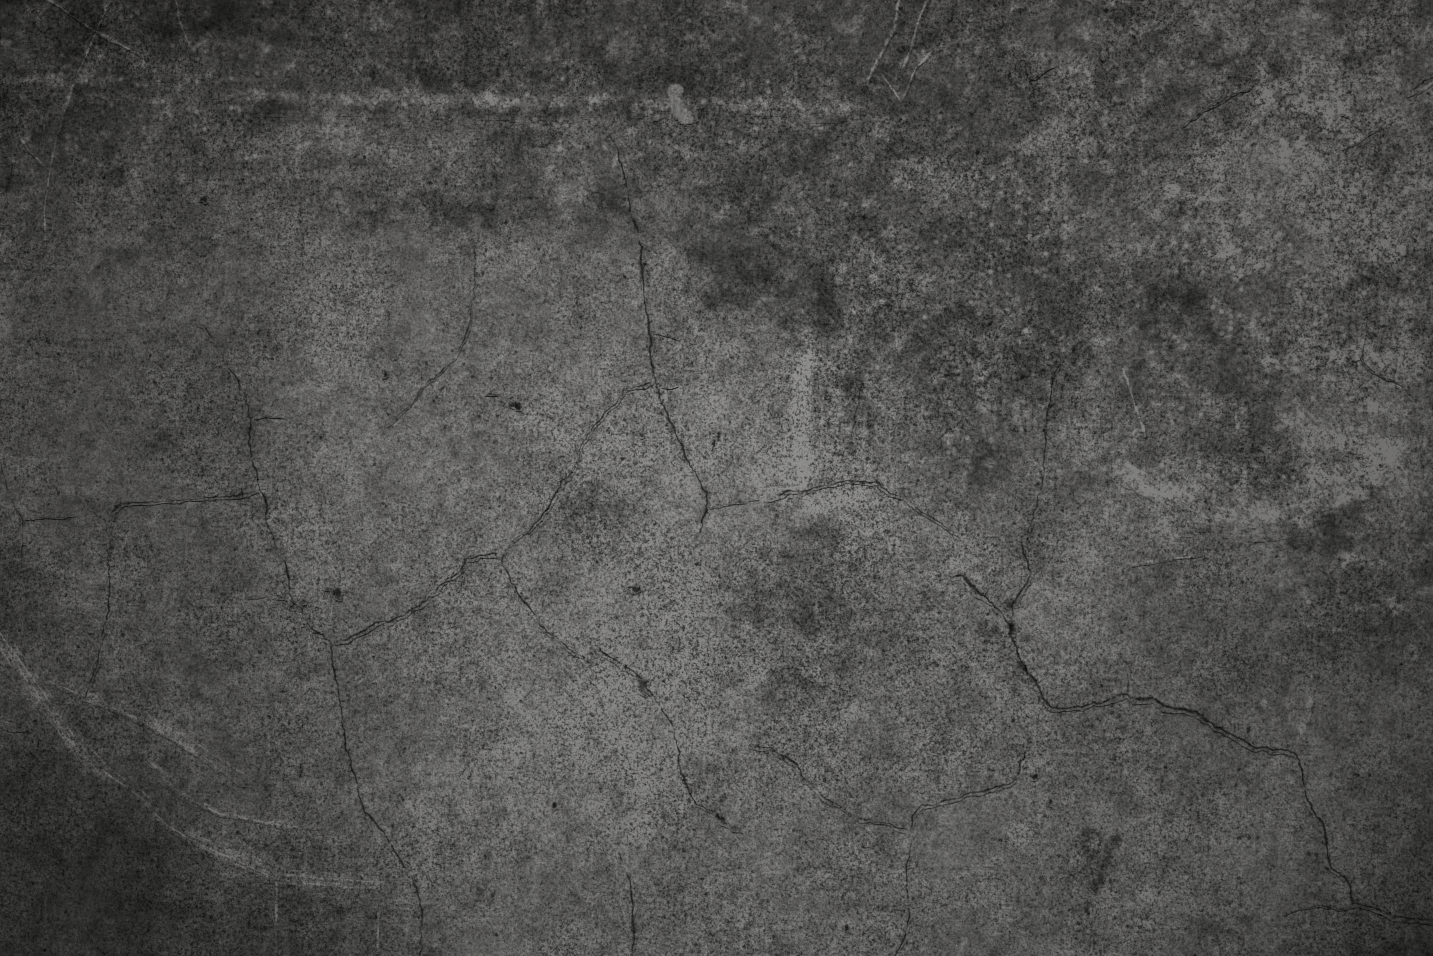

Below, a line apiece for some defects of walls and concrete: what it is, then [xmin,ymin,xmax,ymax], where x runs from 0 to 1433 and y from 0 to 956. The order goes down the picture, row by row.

crack [0,105,962,956]
crack [748,353,1433,956]
crack [1353,304,1411,395]